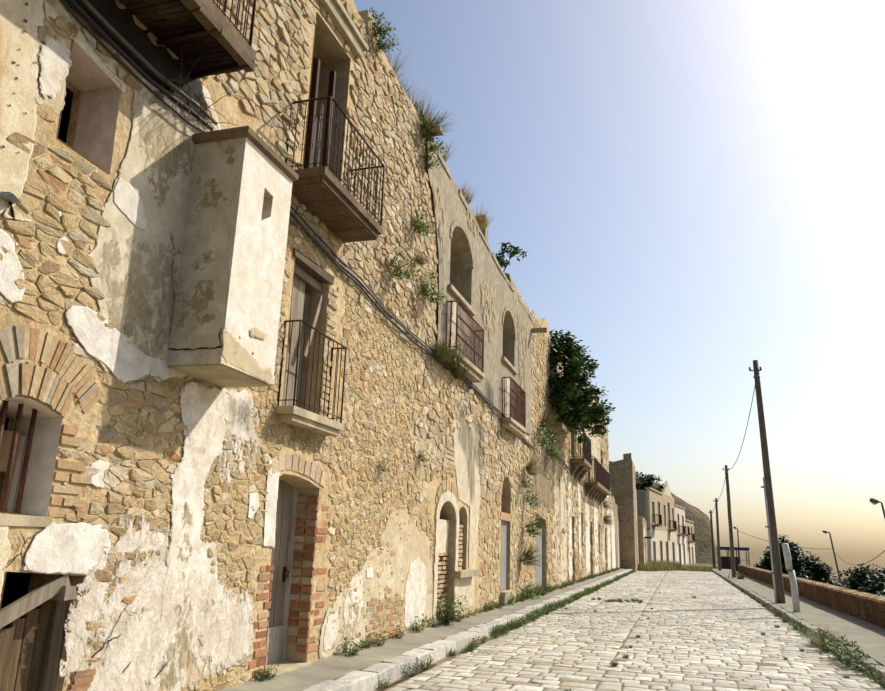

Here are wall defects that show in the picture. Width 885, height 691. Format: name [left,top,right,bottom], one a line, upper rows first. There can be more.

crack [157,170,237,351]
flaking render [0,0,254,691]
flaking render [222,328,273,384]
flaking render [263,460,280,548]
crack [92,601,132,657]